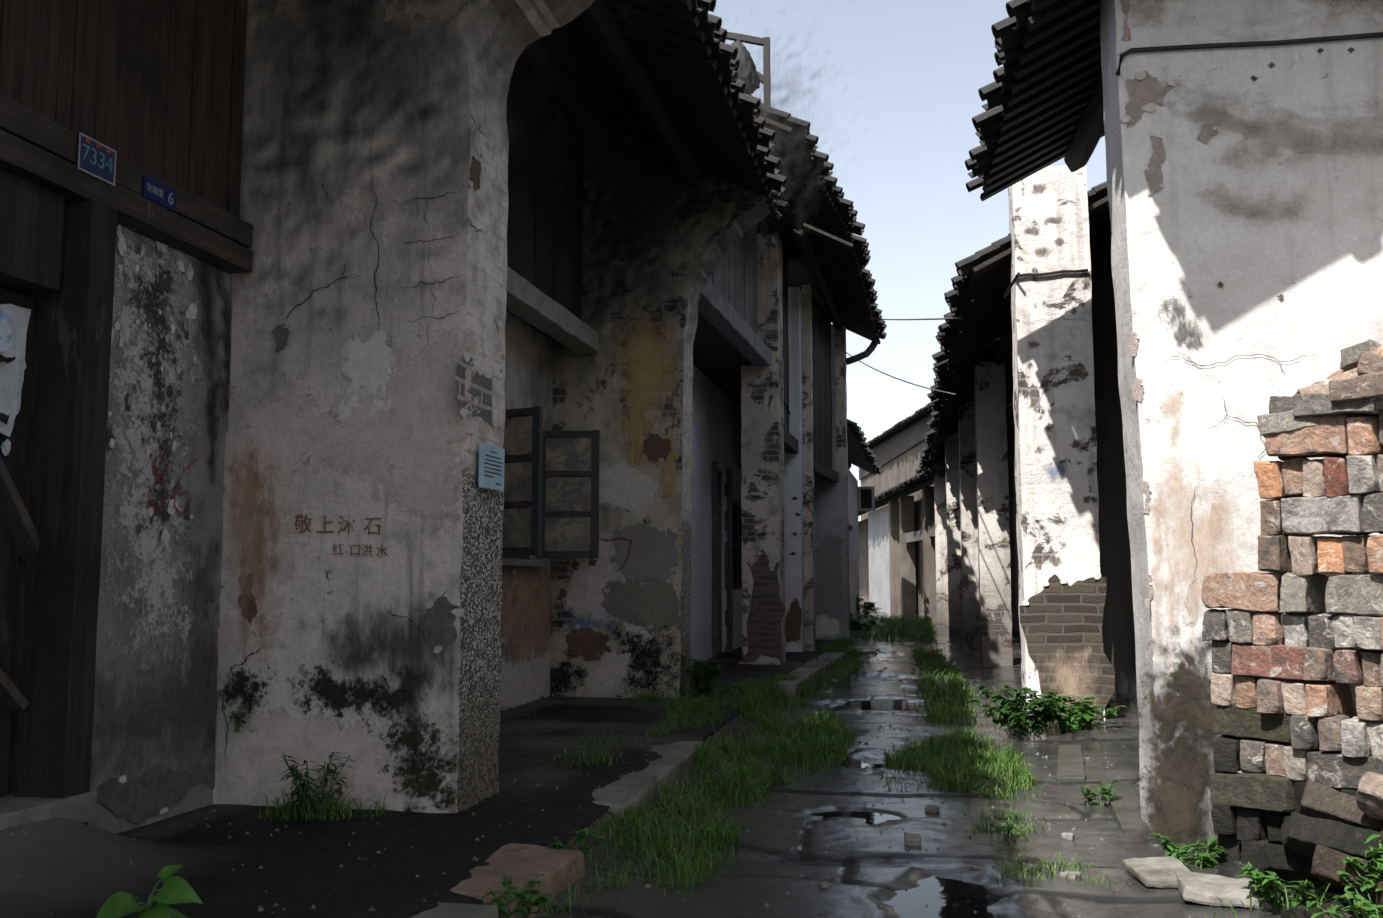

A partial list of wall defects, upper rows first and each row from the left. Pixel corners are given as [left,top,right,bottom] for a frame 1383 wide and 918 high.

flaking render [738,497,841,664]